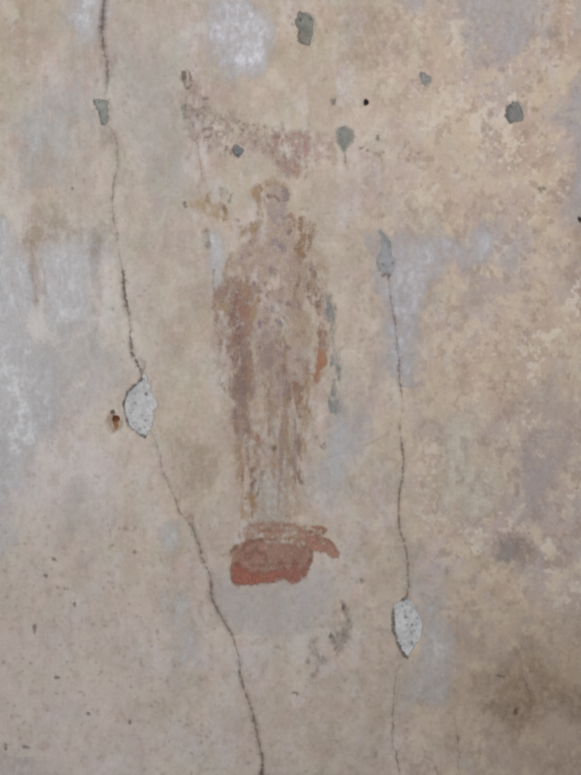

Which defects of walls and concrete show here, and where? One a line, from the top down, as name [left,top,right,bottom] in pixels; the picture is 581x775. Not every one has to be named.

crack [98,0,106,46]
spalling [295,11,313,46]
spalling [505,102,523,124]
crack [122,271,141,370]